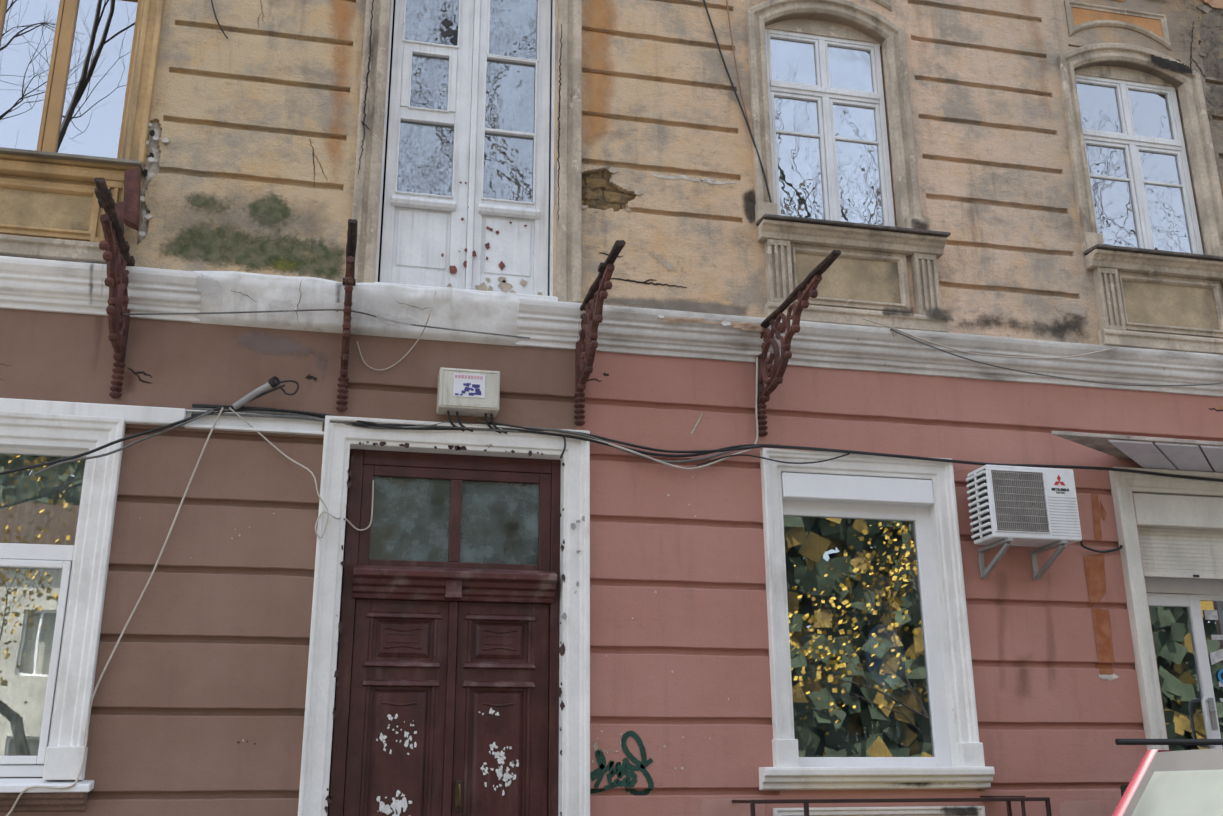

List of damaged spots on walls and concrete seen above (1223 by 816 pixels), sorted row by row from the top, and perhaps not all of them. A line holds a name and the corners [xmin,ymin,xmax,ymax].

spalling [1151,0,1223,115]
spalling [581,167,643,212]